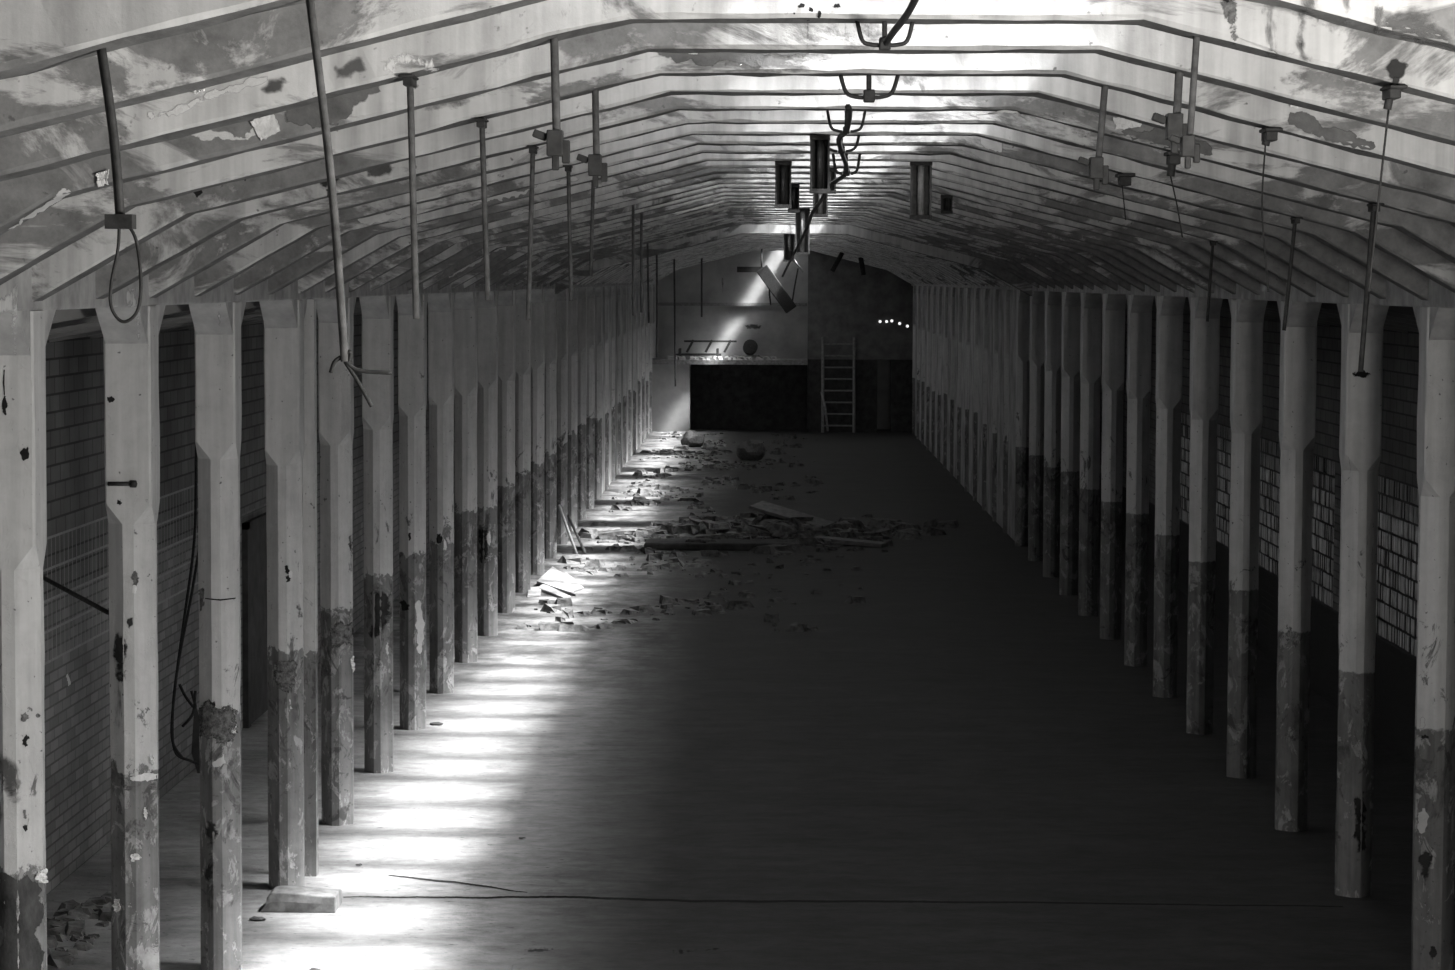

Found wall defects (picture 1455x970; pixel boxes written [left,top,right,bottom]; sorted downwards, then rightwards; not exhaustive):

spalling [199,700,238,767]
peeling [0,868,48,970]